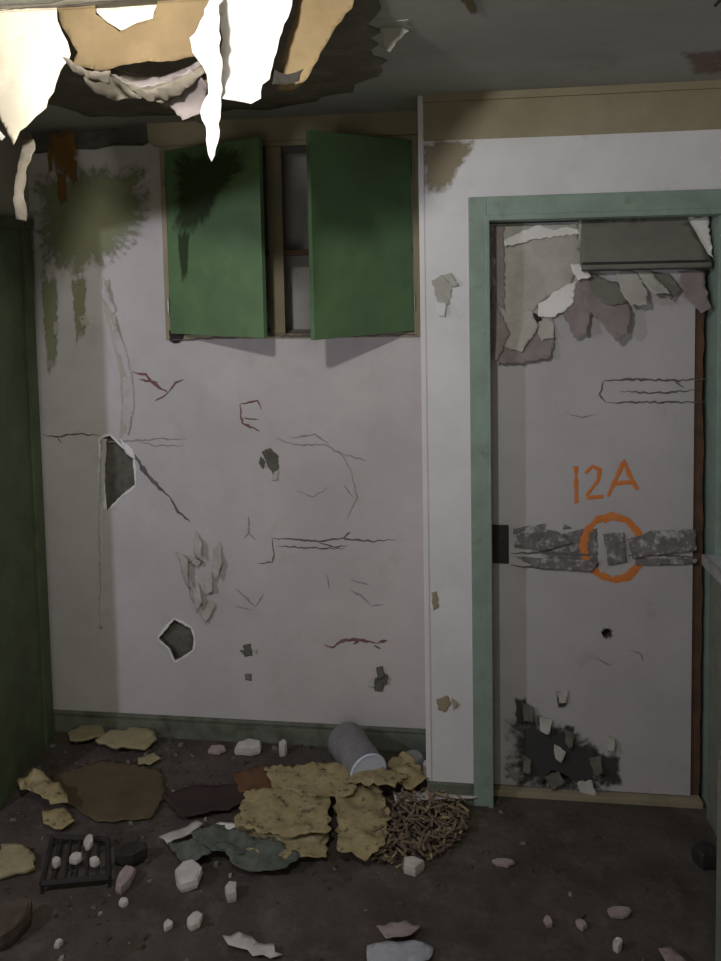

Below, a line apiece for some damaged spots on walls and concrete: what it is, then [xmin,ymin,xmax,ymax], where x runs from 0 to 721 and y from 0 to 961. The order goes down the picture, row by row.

peeling [0,0,412,222]
rust [47,131,77,203]
damp [42,279,58,370]
damp [34,168,150,340]
peeling [490,217,713,364]
crack [132,371,184,401]
crack [572,378,704,418]
peeling [98,279,137,628]
crack [45,432,190,522]
spalling [259,448,279,481]
crack [239,400,390,564]
spalling [157,618,196,662]